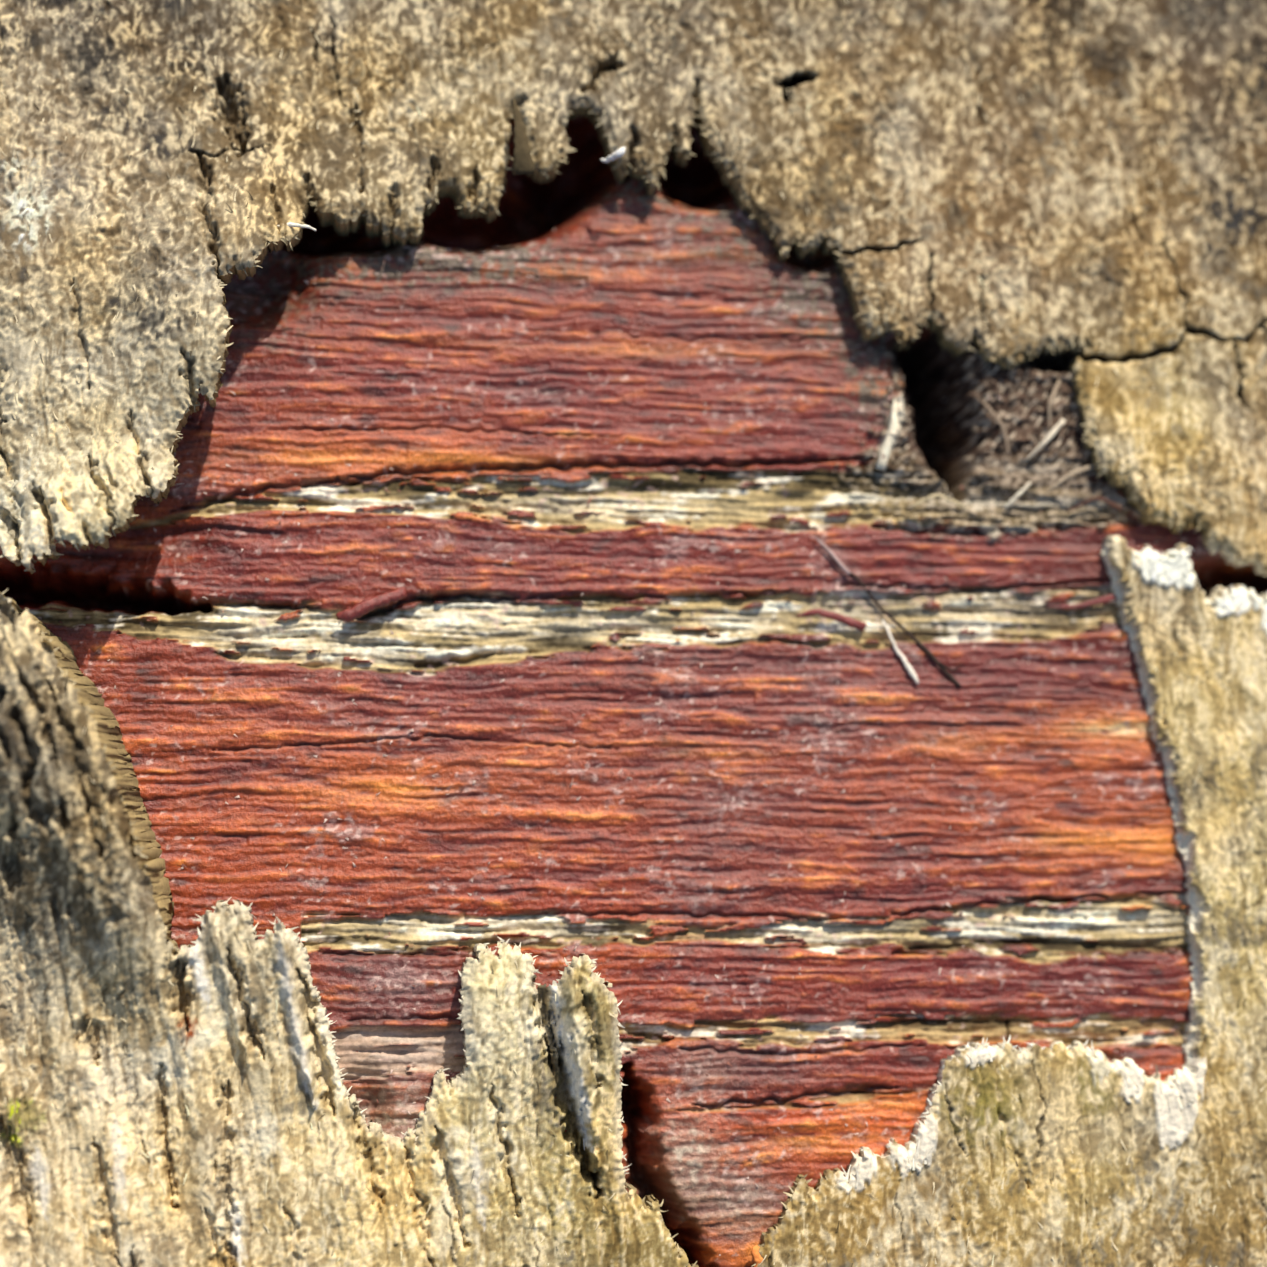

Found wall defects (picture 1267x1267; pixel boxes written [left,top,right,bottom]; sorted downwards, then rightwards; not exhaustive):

peeling [0,197,257,569]
peeling [130,116,1142,544]
crack [841,239,922,256]
crack [1081,328,1248,409]
peeling [0,469,1267,1267]